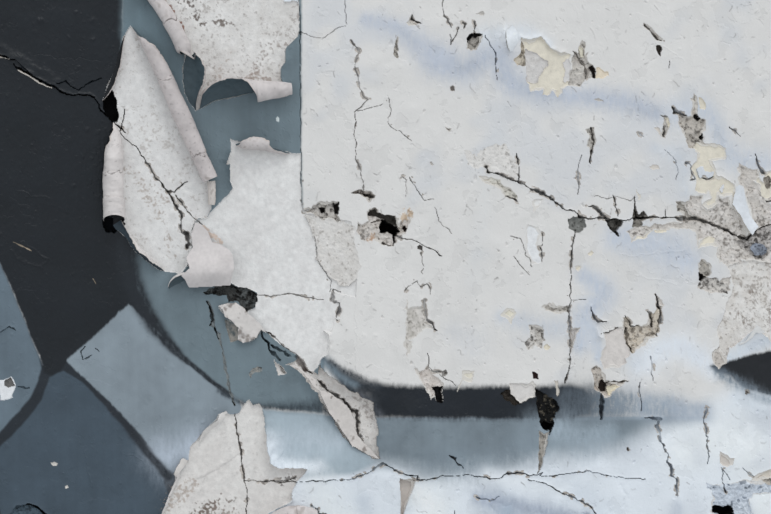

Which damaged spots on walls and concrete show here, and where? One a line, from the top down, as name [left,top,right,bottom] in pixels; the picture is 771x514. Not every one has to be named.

crack [0,55,203,251]
crack [298,0,410,214]
peeling [506,25,609,97]
peeling [102,0,442,514]
crack [484,154,770,384]
spalling [605,93,771,369]
spalling [414,353,475,403]
spalling [591,294,665,420]
spalling [12,503,46,514]
crack [234,414,646,514]
spalling [706,452,771,514]